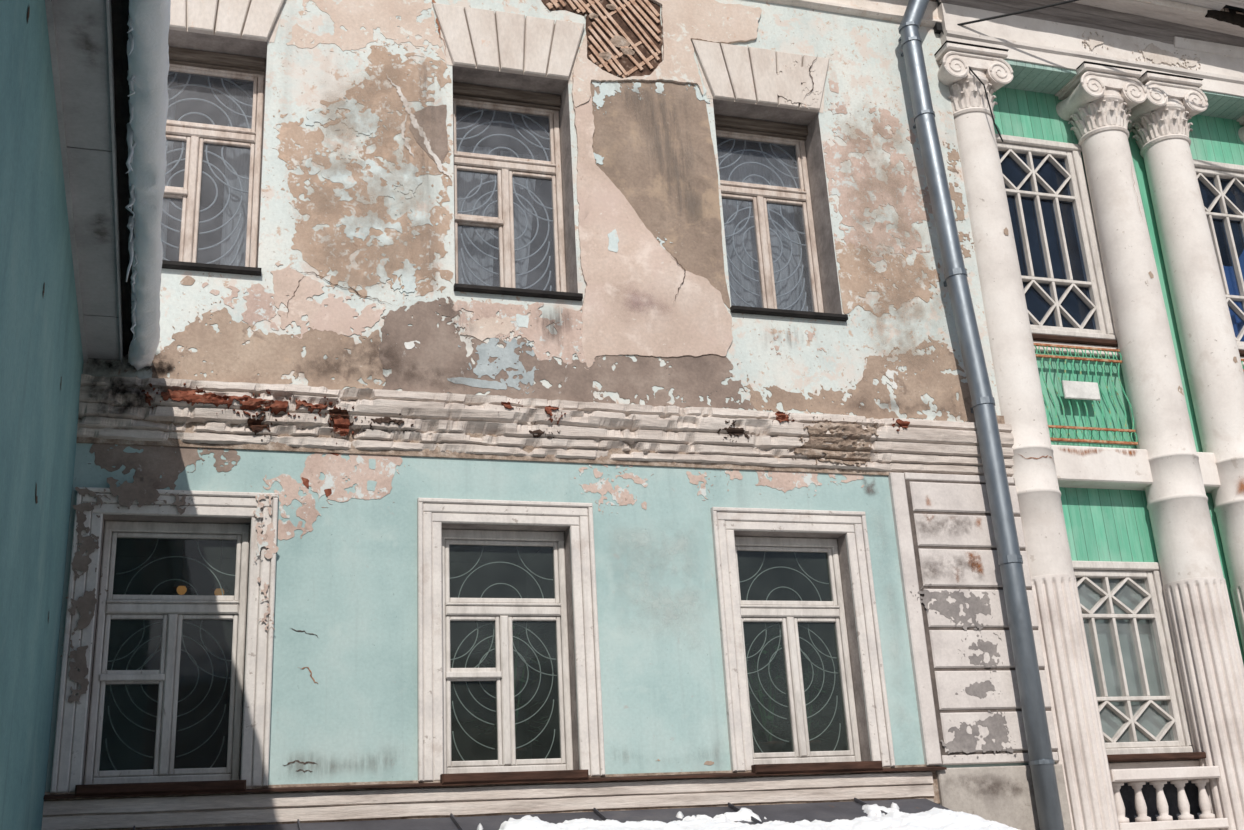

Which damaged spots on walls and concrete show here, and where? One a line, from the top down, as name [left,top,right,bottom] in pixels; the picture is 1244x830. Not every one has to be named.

crack [387,75,452,181]
crack [287,268,390,316]
peeling [180,0,910,501]
peeling [61,444,240,702]
spalling [141,383,411,561]
peeling [574,464,648,512]
peeling [910,581,1017,759]